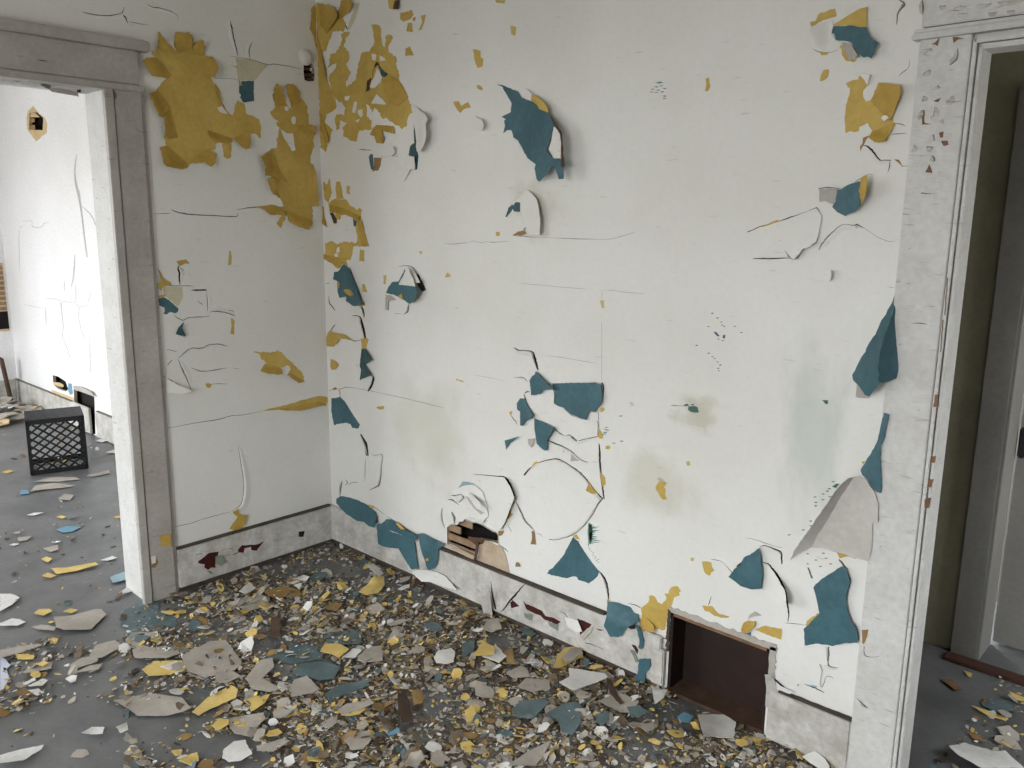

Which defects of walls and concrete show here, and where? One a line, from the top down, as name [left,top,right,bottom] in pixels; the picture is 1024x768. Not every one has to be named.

peeling [808,7,907,151]
peeling [143,0,428,317]
peeling [499,85,564,182]
crack [755,224,893,260]
crack [166,308,238,390]
peeling [505,347,610,463]
peeling [338,481,415,535]
spalling [446,519,521,573]
crack [515,444,605,545]
peeling [804,551,879,657]